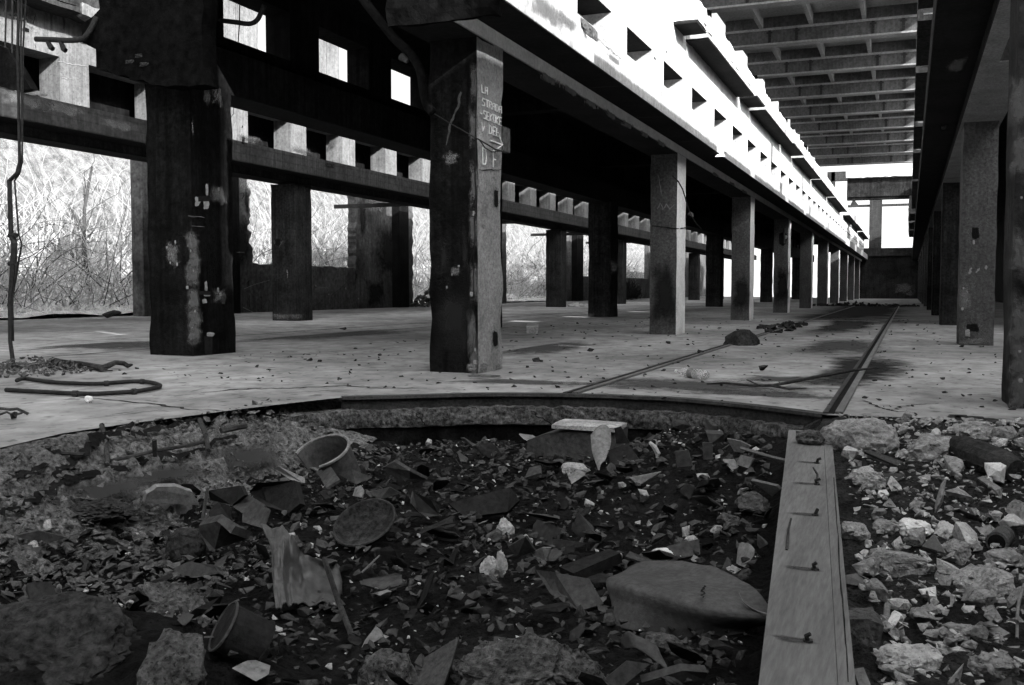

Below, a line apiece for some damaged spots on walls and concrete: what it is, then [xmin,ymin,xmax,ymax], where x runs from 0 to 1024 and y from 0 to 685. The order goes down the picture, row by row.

spalling [166,232,202,344]